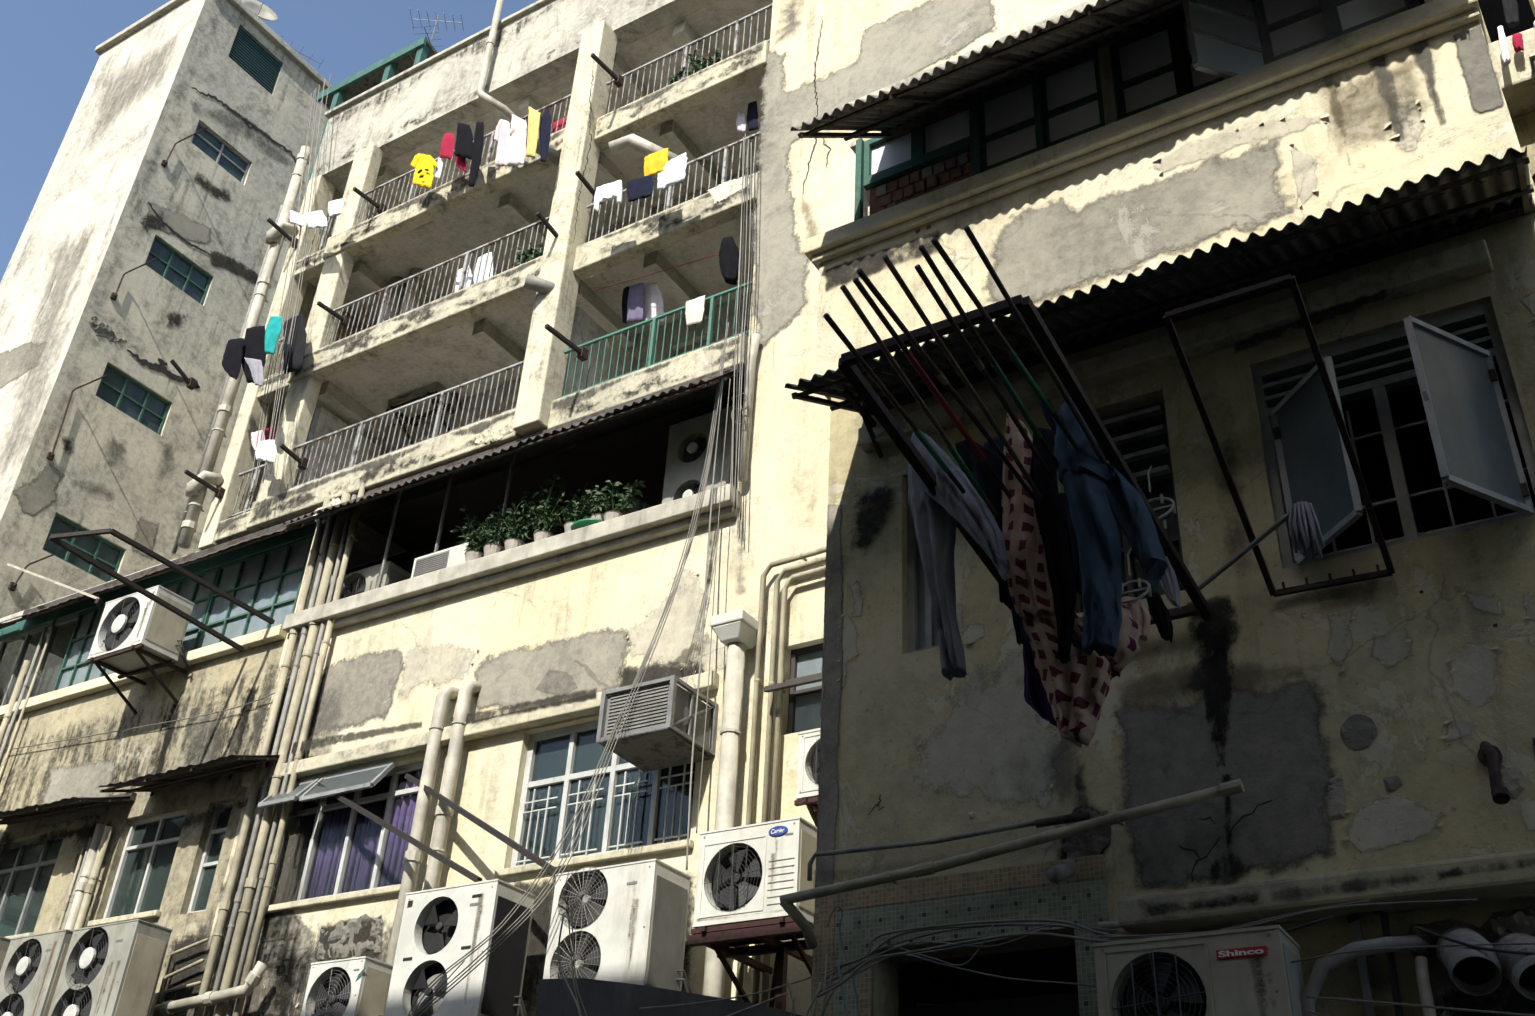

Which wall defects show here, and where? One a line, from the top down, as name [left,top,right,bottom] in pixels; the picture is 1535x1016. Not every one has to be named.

crack [192,87,296,162]
crack [802,19,831,194]
leakage [1329,39,1445,137]
crack [127,349,200,389]
peeling [536,660,612,695]
leakage [0,665,422,811]
peeling [909,650,1067,819]
leakage [1124,596,1416,915]
leakage [0,817,111,889]
leakage [164,778,393,1016]
crack [1178,800,1273,883]
peeling [1341,776,1444,852]